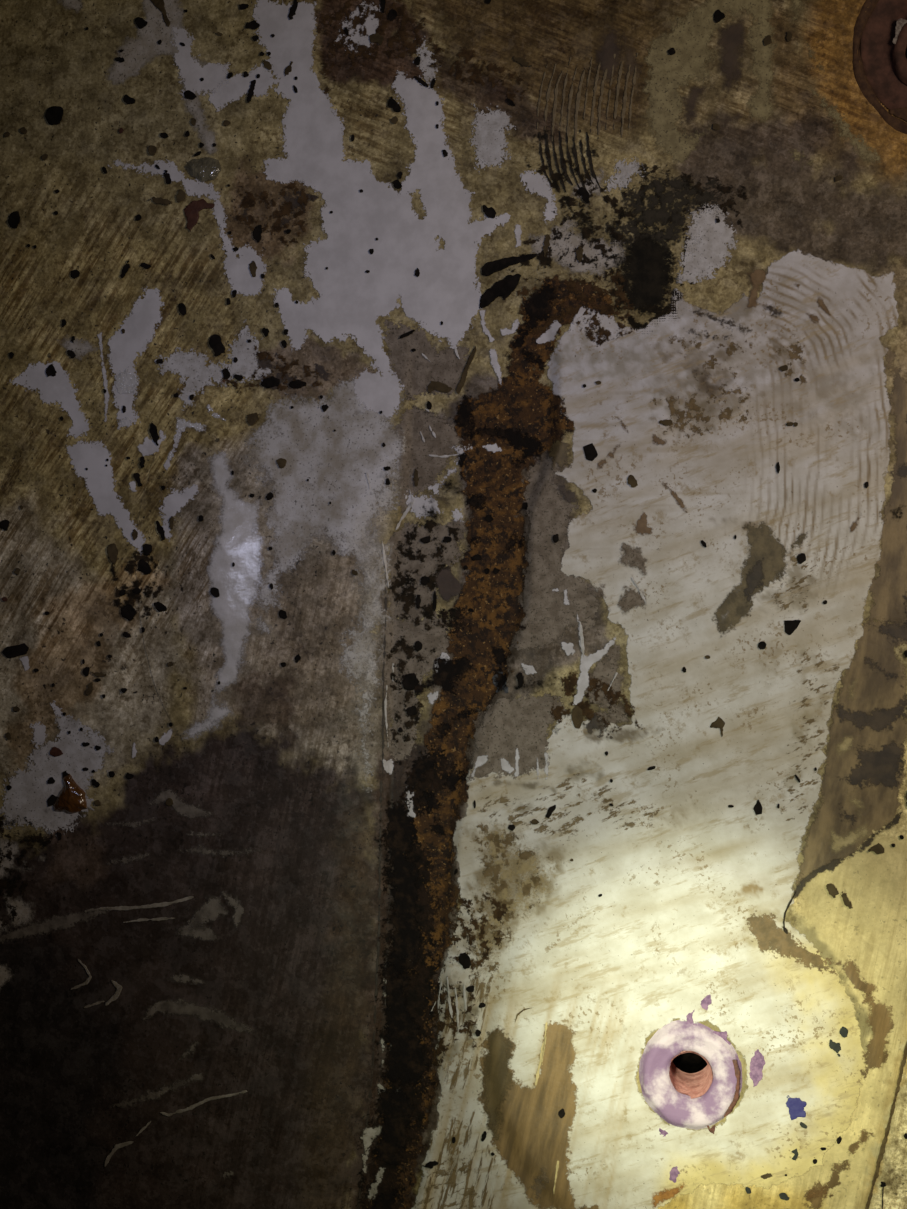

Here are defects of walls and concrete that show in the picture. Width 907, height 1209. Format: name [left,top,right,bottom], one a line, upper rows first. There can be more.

peeling [642,0,778,163]
peeling [520,170,625,276]
peeling [10,287,276,555]
peeling [2,643,30,670]
peeling [0,701,114,879]
peeling [108,0,521,1094]
corrosion [366,274,618,1209]
peeling [411,204,899,1209]
water stain [793,349,907,899]
peeling [360,1126,386,1199]
water stain [478,1021,598,1209]
crack [865,1042,907,1209]